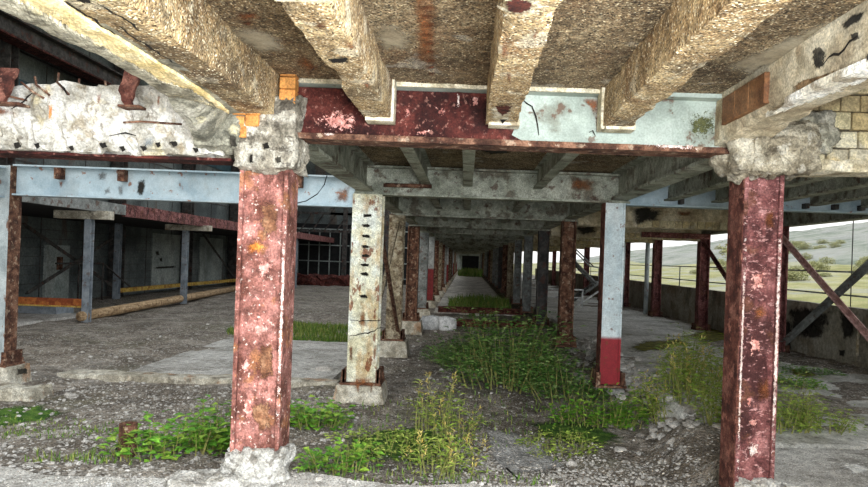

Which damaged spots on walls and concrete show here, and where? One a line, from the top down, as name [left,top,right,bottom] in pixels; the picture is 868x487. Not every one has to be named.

leakage [843,12,864,28]
rust [298,87,520,140]
rust [249,202,278,252]
rust [259,343,273,378]